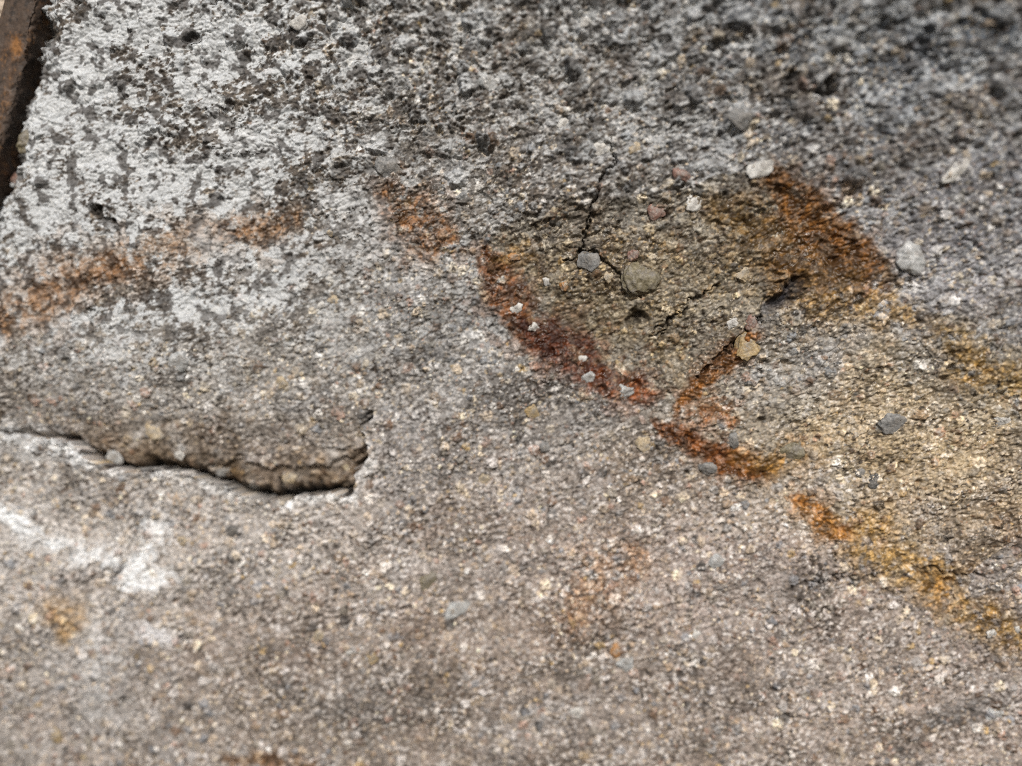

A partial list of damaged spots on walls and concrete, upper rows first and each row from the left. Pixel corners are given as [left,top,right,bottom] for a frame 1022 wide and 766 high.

crack [579,139,618,250]
crack [18,410,380,514]
rust [364,151,1022,669]
rust [29,583,106,651]